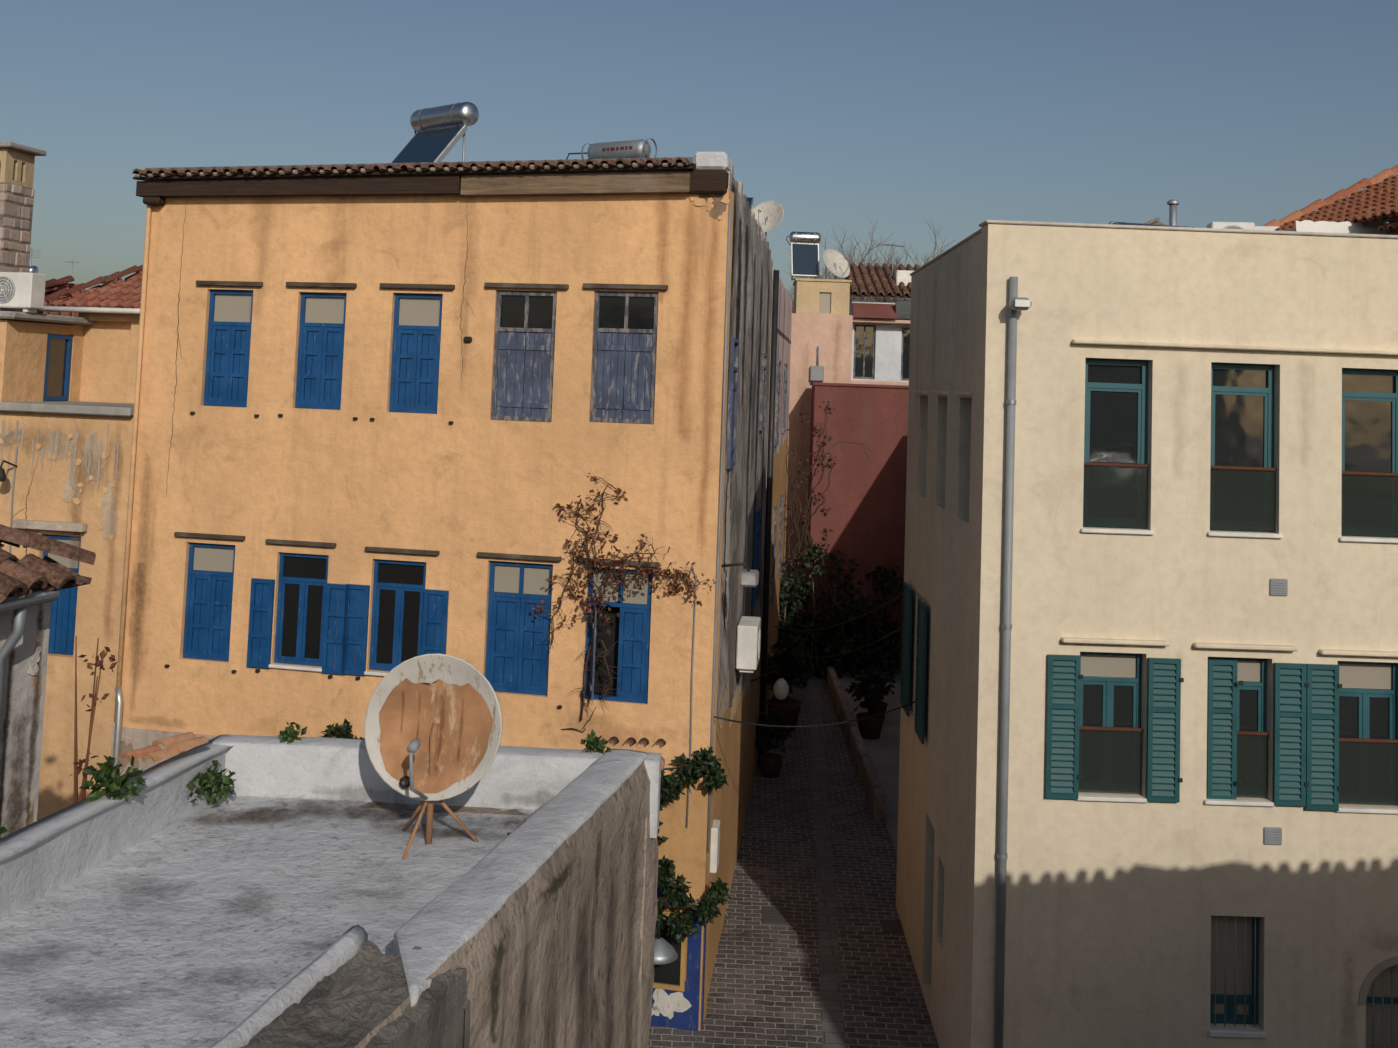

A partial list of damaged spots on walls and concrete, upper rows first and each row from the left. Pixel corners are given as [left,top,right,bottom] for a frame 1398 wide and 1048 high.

peeling [0,428,118,539]